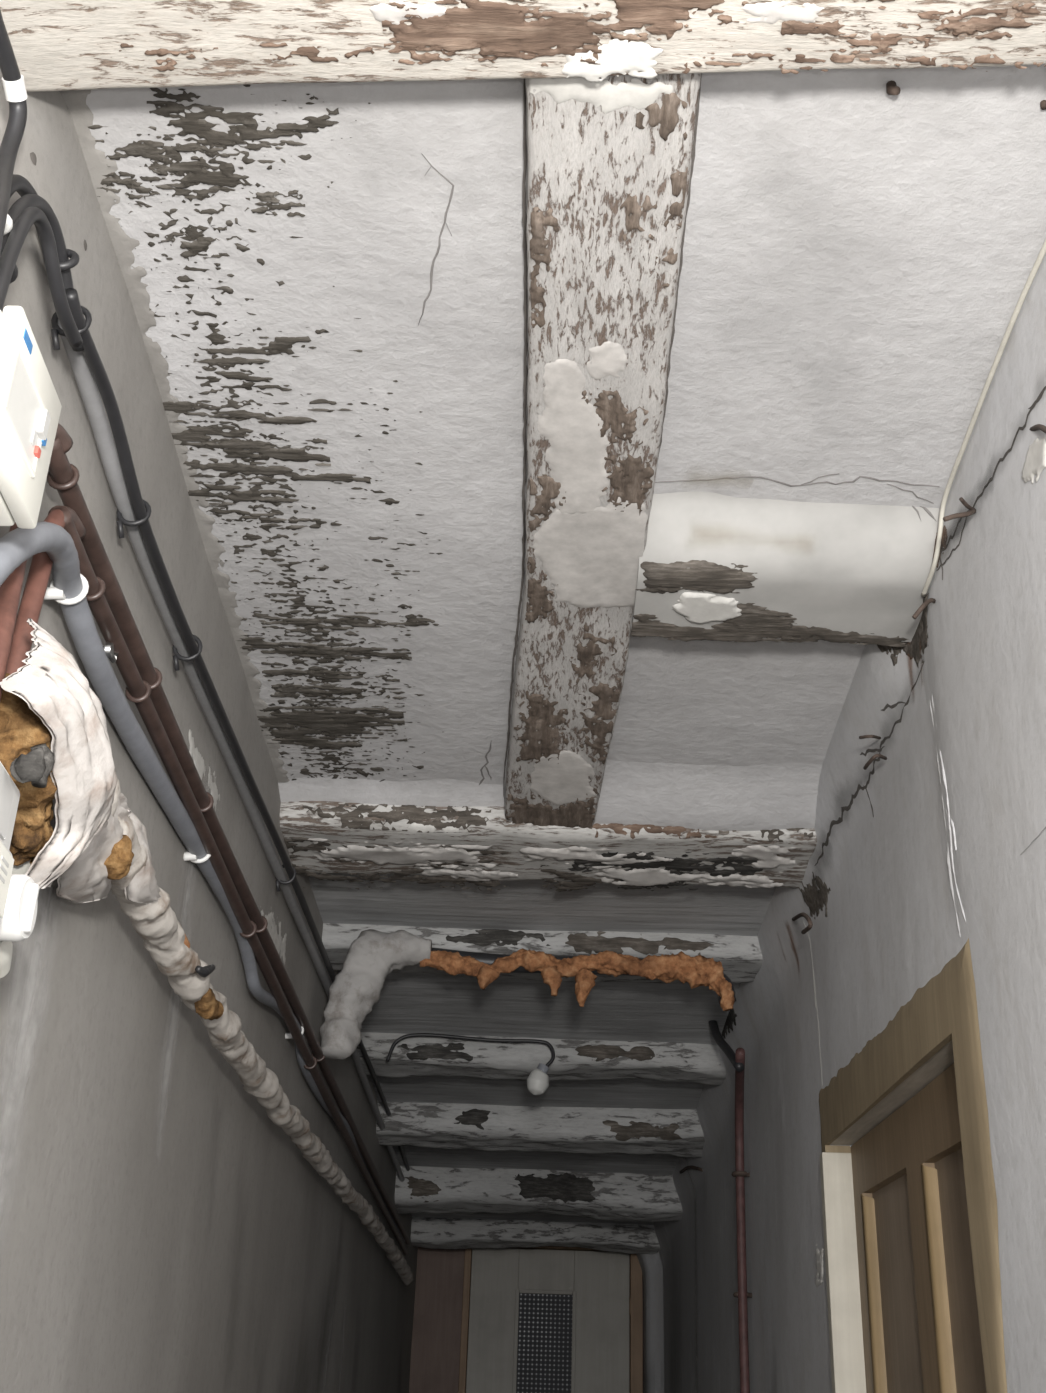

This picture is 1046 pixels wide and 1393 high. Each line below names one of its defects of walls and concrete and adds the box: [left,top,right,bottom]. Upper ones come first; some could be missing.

peeling [119,35,218,71]
peeling [260,0,1046,82]
peeling [635,92,687,141]
crack [418,154,454,325]
peeling [530,207,560,328]
peeling [620,167,688,287]
peeling [121,125,443,779]
peeling [528,474,566,532]
peeling [582,387,654,515]
flaking render [513,557,929,765]
crack [815,661,925,866]
peeling [290,788,831,919]